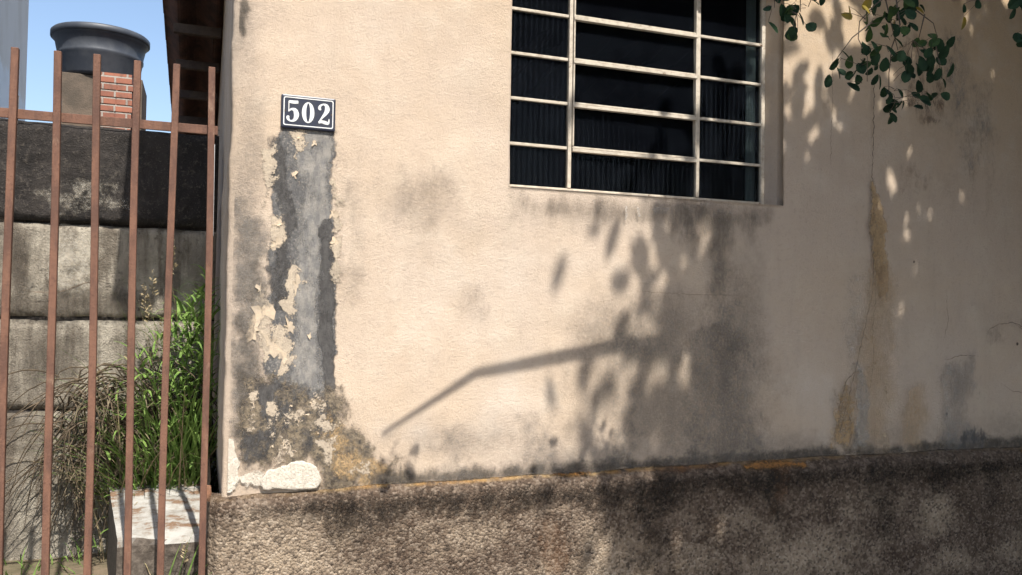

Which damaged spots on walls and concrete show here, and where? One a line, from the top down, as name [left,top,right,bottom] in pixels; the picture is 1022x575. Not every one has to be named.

peeling [227,128,411,493]
crack [830,85,889,448]